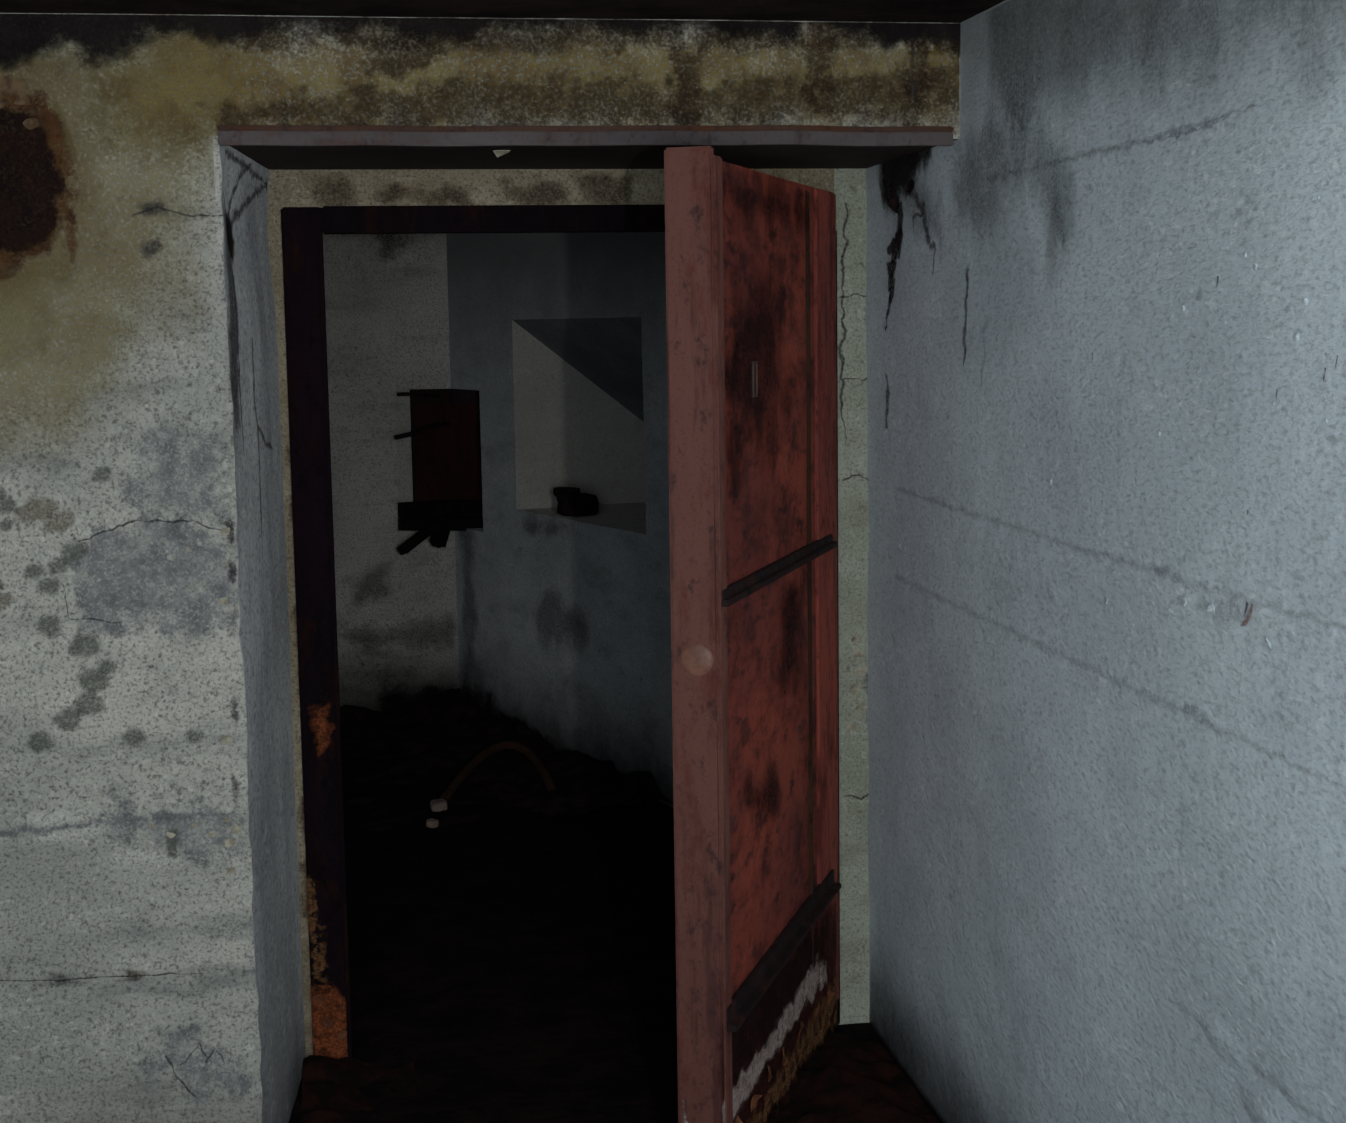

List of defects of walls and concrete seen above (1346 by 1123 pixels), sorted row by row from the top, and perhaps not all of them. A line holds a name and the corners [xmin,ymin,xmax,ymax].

corrosion [0,73,75,279]
water stain [0,17,961,439]
crack [839,165,936,481]
crack [962,268,970,367]
water stain [0,491,73,531]
water stain [39,616,58,637]
water stain [25,543,86,594]
water stain [30,635,115,752]
corrosion [309,704,335,754]
corrosion [301,865,348,1059]